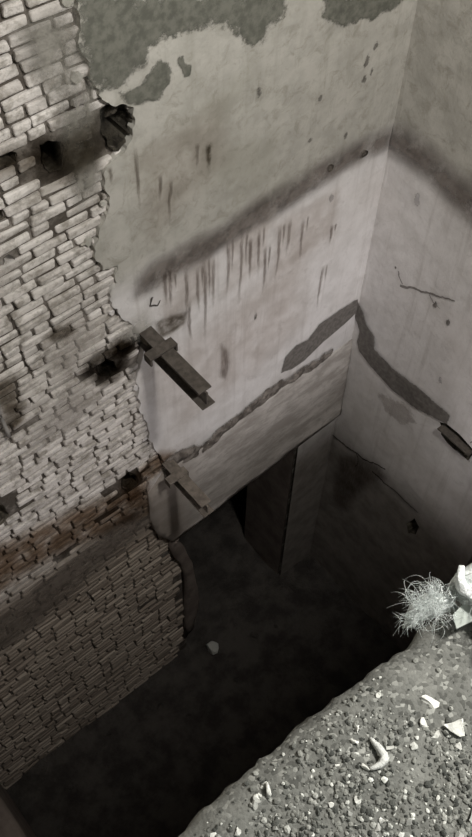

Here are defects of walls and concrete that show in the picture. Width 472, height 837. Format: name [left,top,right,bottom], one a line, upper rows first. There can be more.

flaking render [322,0,401,27]
crack [398,271,455,309]
flaking render [0,0,287,624]
spalling [437,422,472,461]
spalling [0,486,402,837]